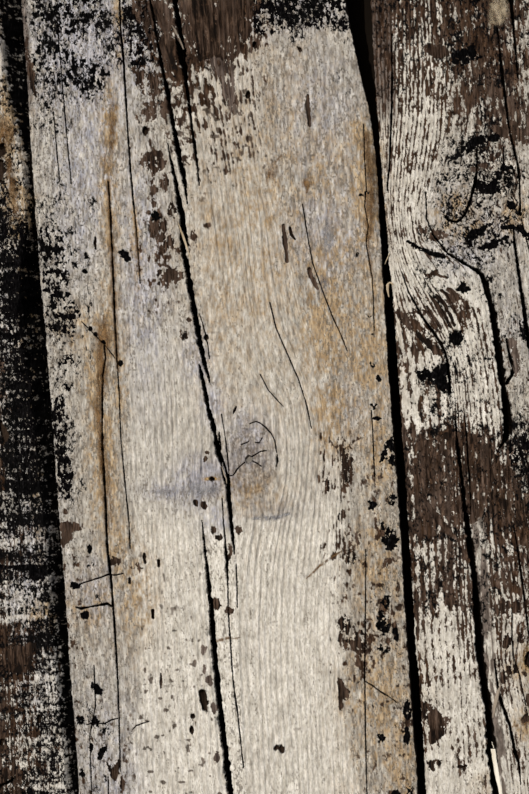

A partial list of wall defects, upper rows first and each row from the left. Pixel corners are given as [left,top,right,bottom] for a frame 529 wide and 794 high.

peeling [0,220,74,506]
peeling [25,0,110,101]
crack [76,182,149,794]
crack [119,0,141,284]
peeling [122,0,178,124]
crack [149,0,279,794]
peeling [182,0,349,113]
peeling [424,42,483,66]
crack [425,0,529,448]
crack [454,417,529,794]
peeling [459,125,529,251]
peeling [495,597,529,619]